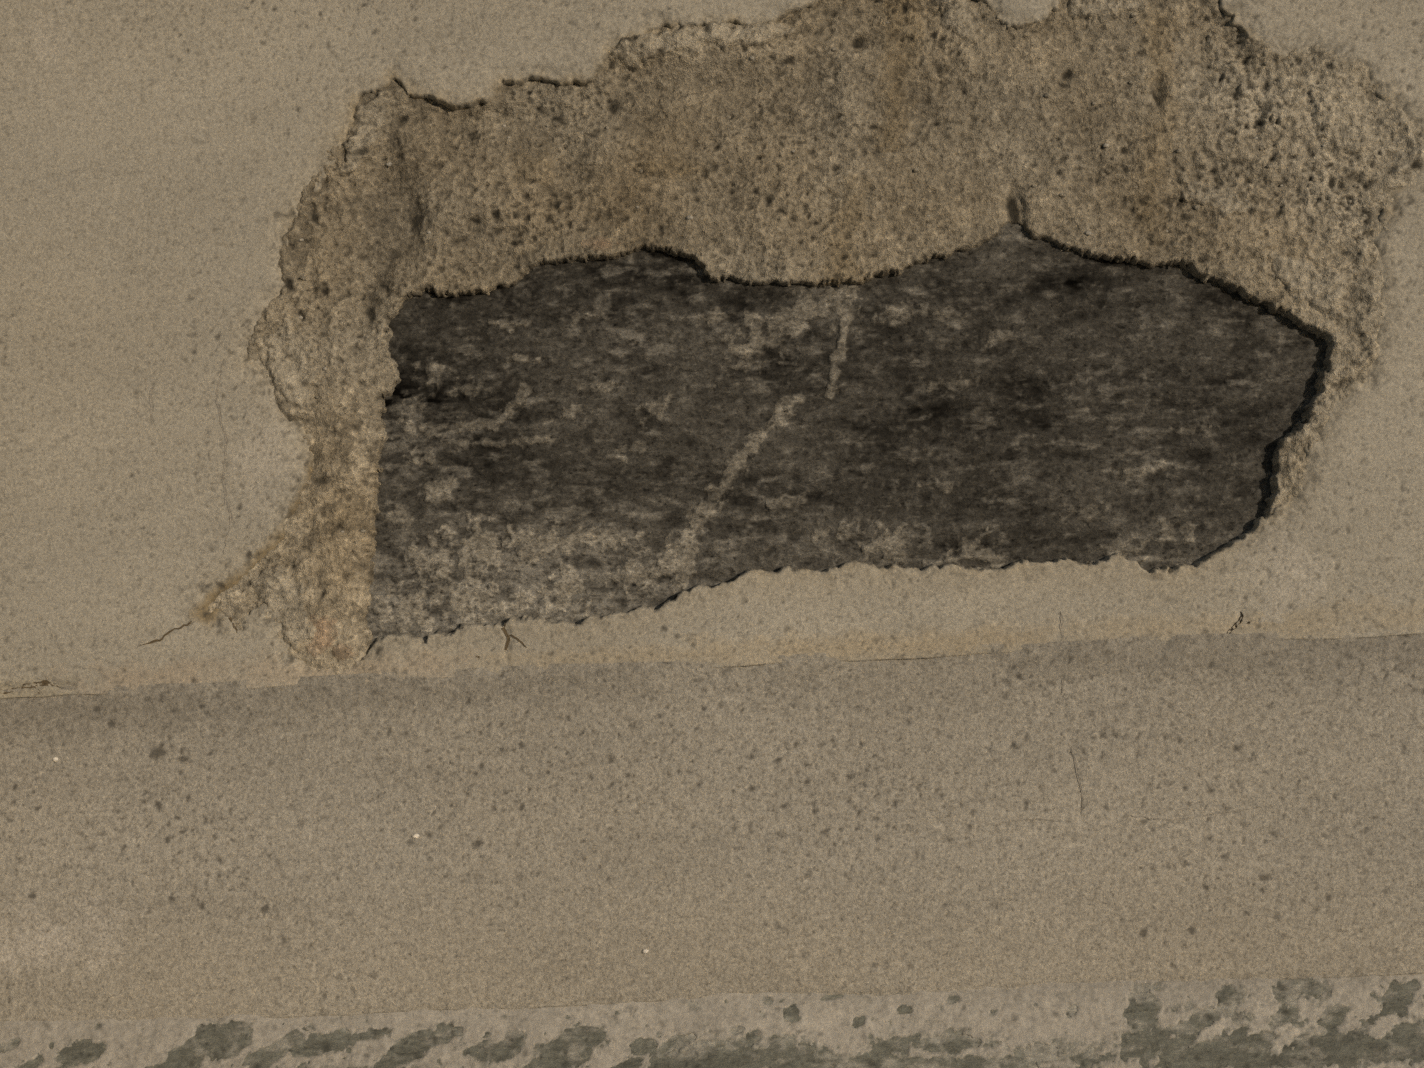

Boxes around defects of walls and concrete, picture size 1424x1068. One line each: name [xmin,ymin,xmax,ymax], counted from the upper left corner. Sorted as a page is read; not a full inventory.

flaking render [208,0,1424,675]
crack [476,619,526,659]
crack [1227,612,1250,634]
crack [1,680,62,695]
crack [996,746,1083,825]